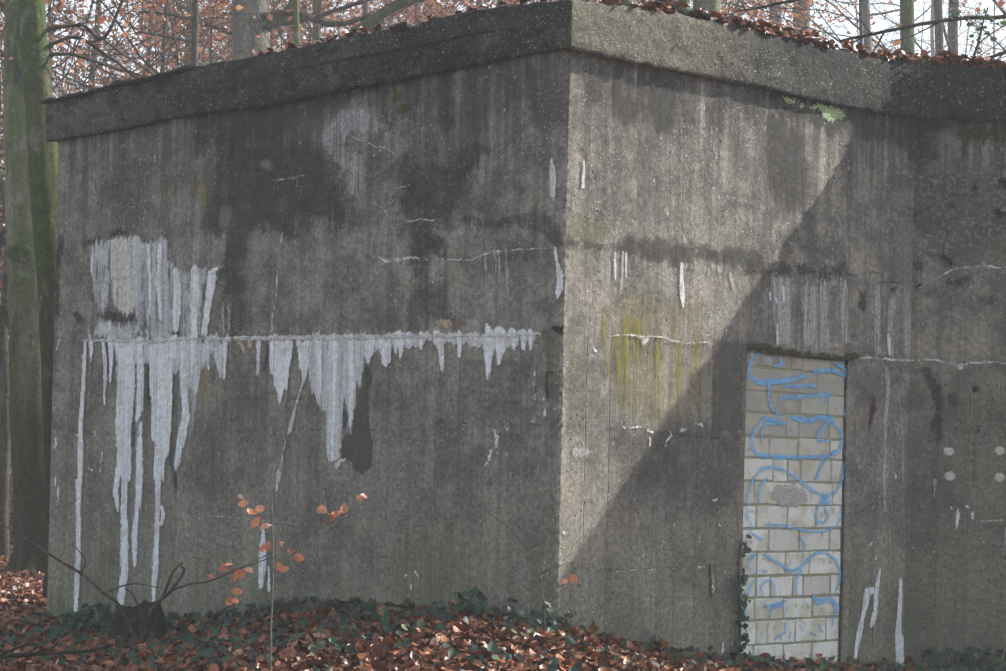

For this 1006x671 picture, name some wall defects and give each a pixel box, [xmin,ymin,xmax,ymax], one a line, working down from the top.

water stain [73,67,535,612]
water stain [742,91,960,217]